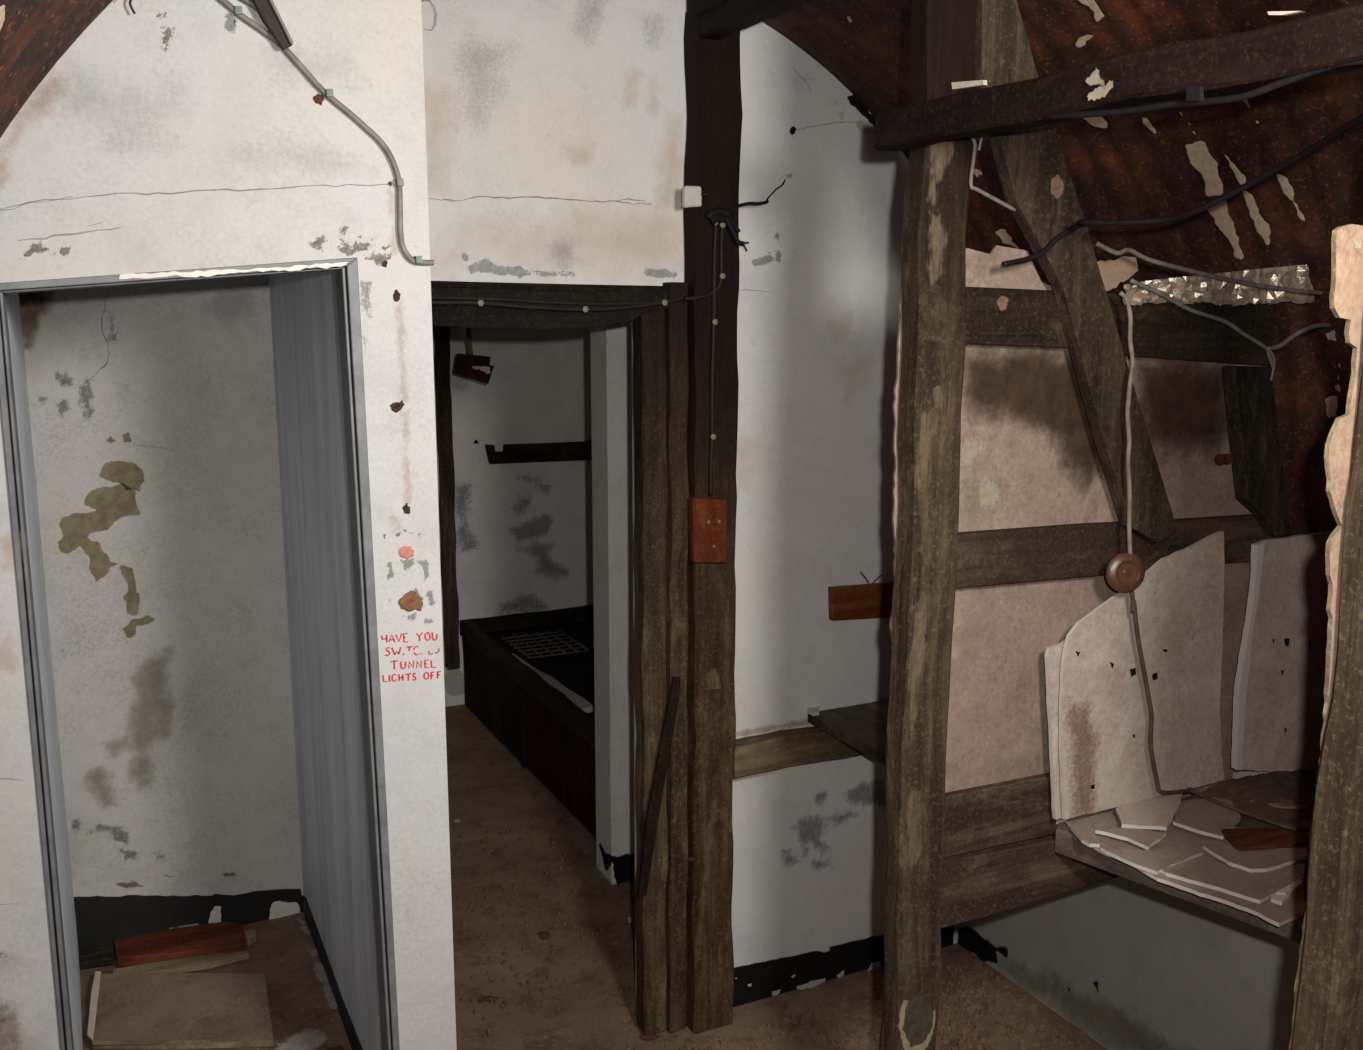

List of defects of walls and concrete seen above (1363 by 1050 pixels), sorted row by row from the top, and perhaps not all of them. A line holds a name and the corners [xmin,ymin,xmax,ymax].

crack [0,184,388,241]
crack [433,196,647,204]
peeling [1179,112,1271,260]
peeling [1277,174,1305,221]
peeling [1325,363,1341,418]
water stain [966,350,1112,501]
water stain [960,436,1007,512]
water stain [509,500,565,572]
spalling [387,558,435,623]
water stain [799,781,886,867]
peeling [1270,895,1290,906]
peeling [791,970,844,990]